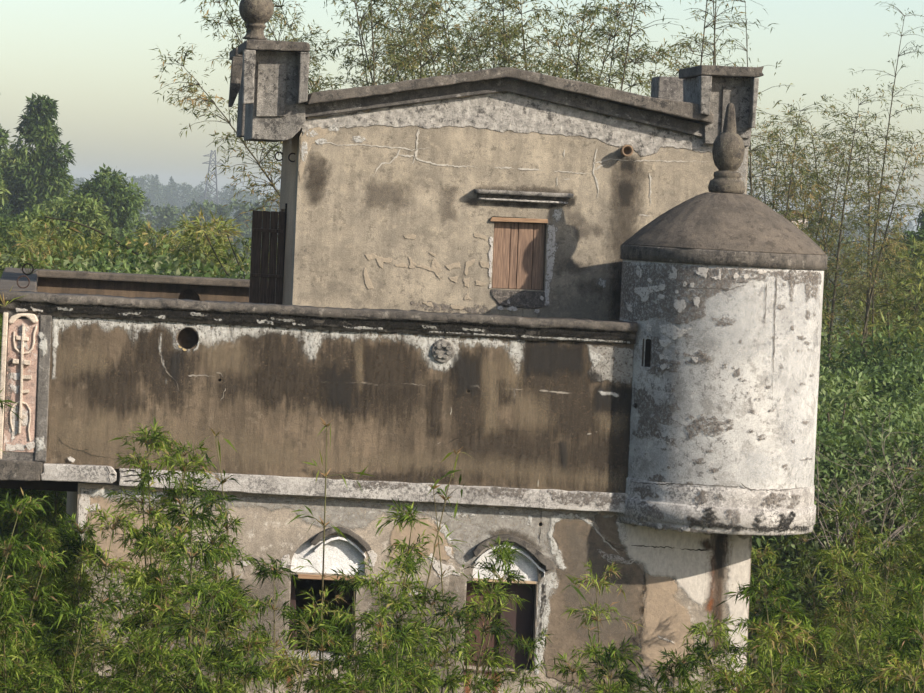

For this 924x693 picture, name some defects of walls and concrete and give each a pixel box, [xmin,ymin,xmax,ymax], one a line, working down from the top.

peeling [301,92,713,157]
crack [319,129,710,216]
damp [18,156,664,521]
peeling [363,208,562,314]
peeling [620,262,822,377]
crack [764,275,777,395]
flaking render [588,345,734,473]
damp [687,490,809,532]
peeling [78,488,715,693]
rust [701,534,728,652]
peeling [725,534,751,689]